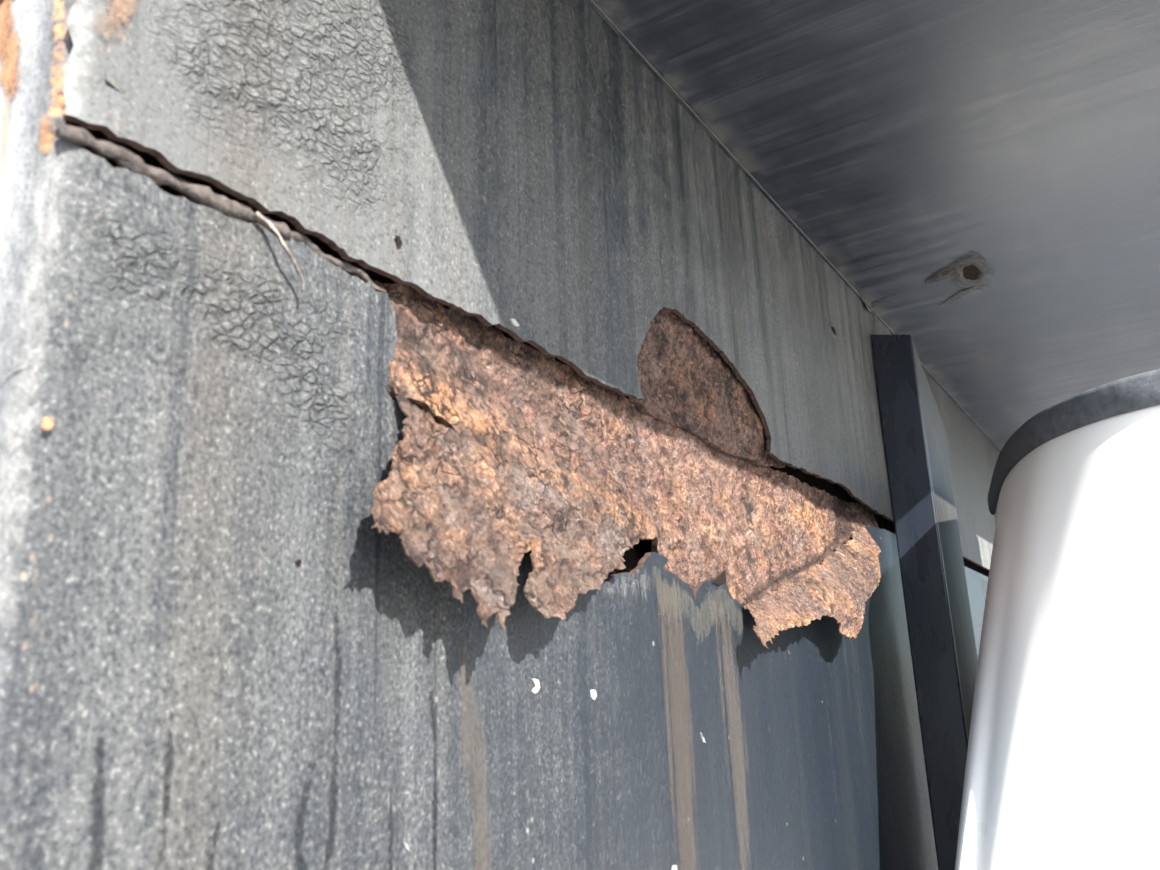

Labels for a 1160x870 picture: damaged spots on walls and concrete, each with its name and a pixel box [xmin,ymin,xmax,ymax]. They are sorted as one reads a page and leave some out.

corrosion [54,0,64,38]
corrosion [0,0,21,144]
corrosion [40,53,64,152]
crack [55,120,575,371]
peeling [926,264,981,306]
corrosion [371,280,881,649]
crack [769,464,896,534]
crack [963,558,972,569]